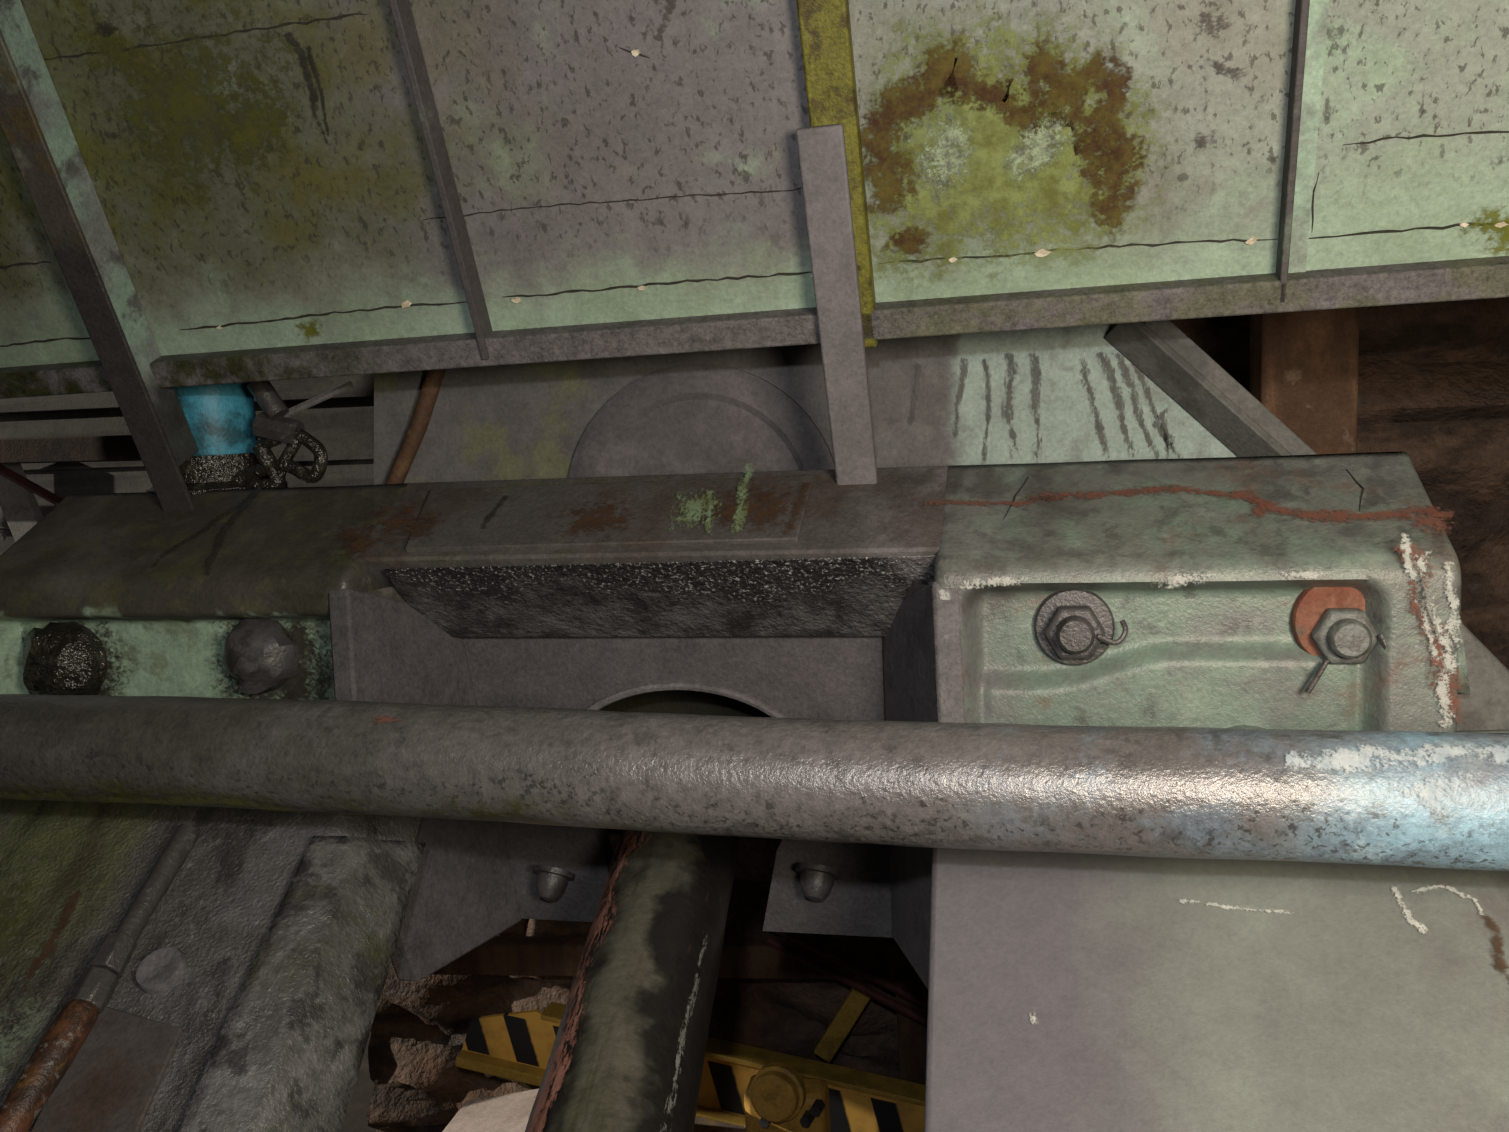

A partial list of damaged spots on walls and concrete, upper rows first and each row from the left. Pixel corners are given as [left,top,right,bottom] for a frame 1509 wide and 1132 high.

damp [285,32,329,143]
damp [860,17,1163,275]
damp [1464,209,1509,253]
rust [671,463,811,534]
rust [924,484,1454,536]